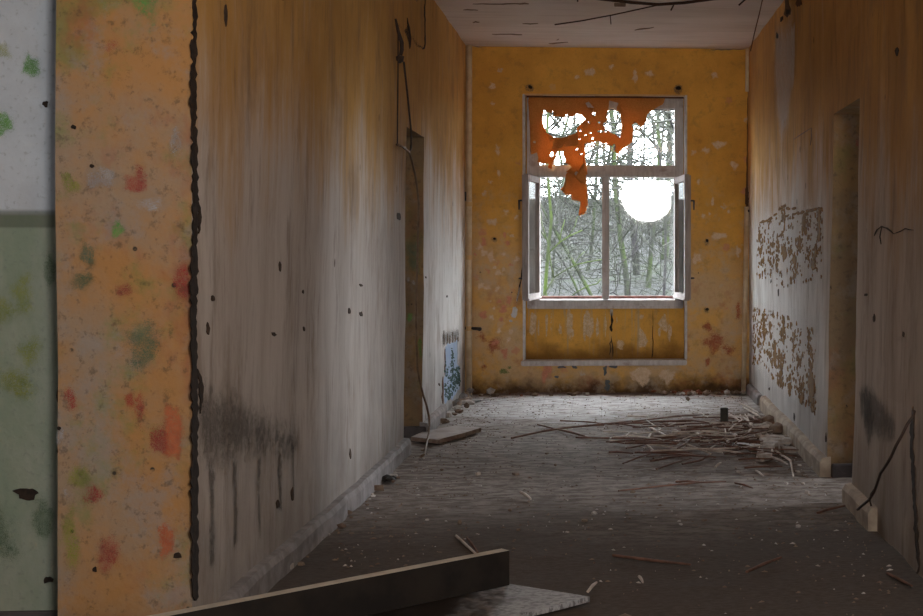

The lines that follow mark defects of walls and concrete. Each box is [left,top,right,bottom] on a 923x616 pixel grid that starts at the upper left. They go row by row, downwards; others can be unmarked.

flaking render [730,98,749,207]
peeling [756,194,824,296]
peeling [752,300,820,421]